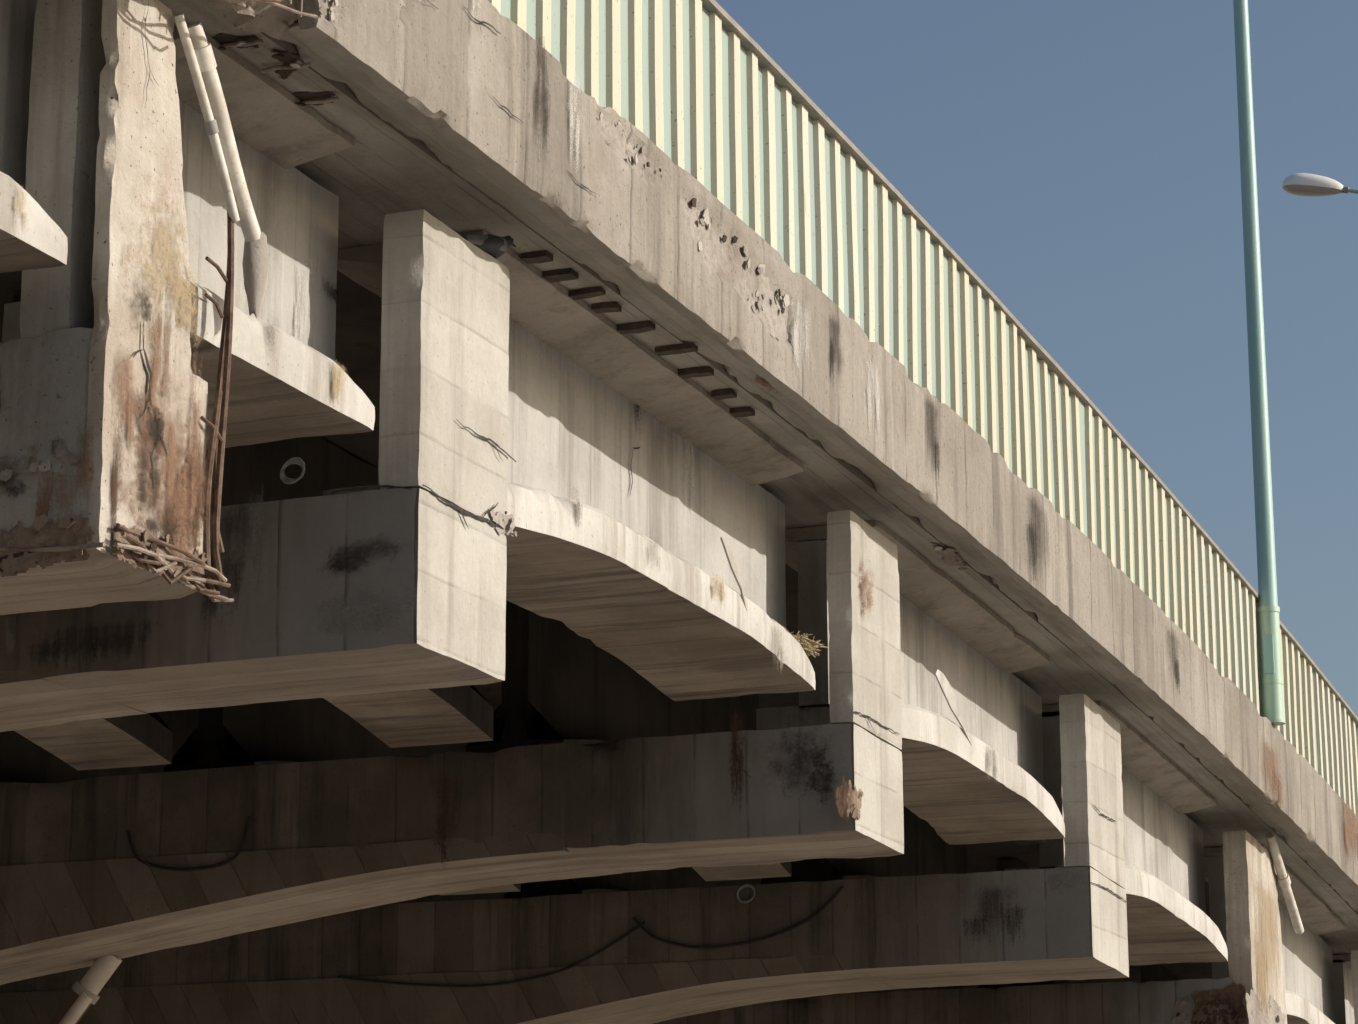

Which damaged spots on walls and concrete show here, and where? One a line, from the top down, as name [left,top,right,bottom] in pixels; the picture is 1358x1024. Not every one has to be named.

spalling [203,0,341,80]
spalling [293,92,339,106]
spalling [596,112,661,182]
spalling [680,198,794,344]
damp [830,319,841,376]
spalling [0,210,235,602]
rust [112,318,206,554]
crack [330,484,513,535]
damp [1029,499,1046,566]
spalling [1170,982,1286,1024]